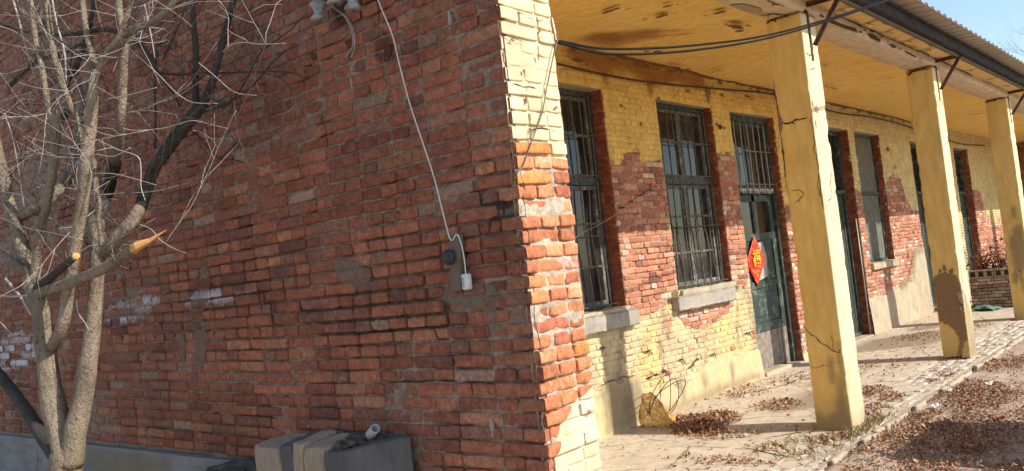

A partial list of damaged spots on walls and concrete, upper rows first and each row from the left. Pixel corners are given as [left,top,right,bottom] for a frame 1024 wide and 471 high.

crack [773,81,832,207]
peeling [610,137,749,340]
peeling [854,166,923,298]
crack [739,330,842,394]